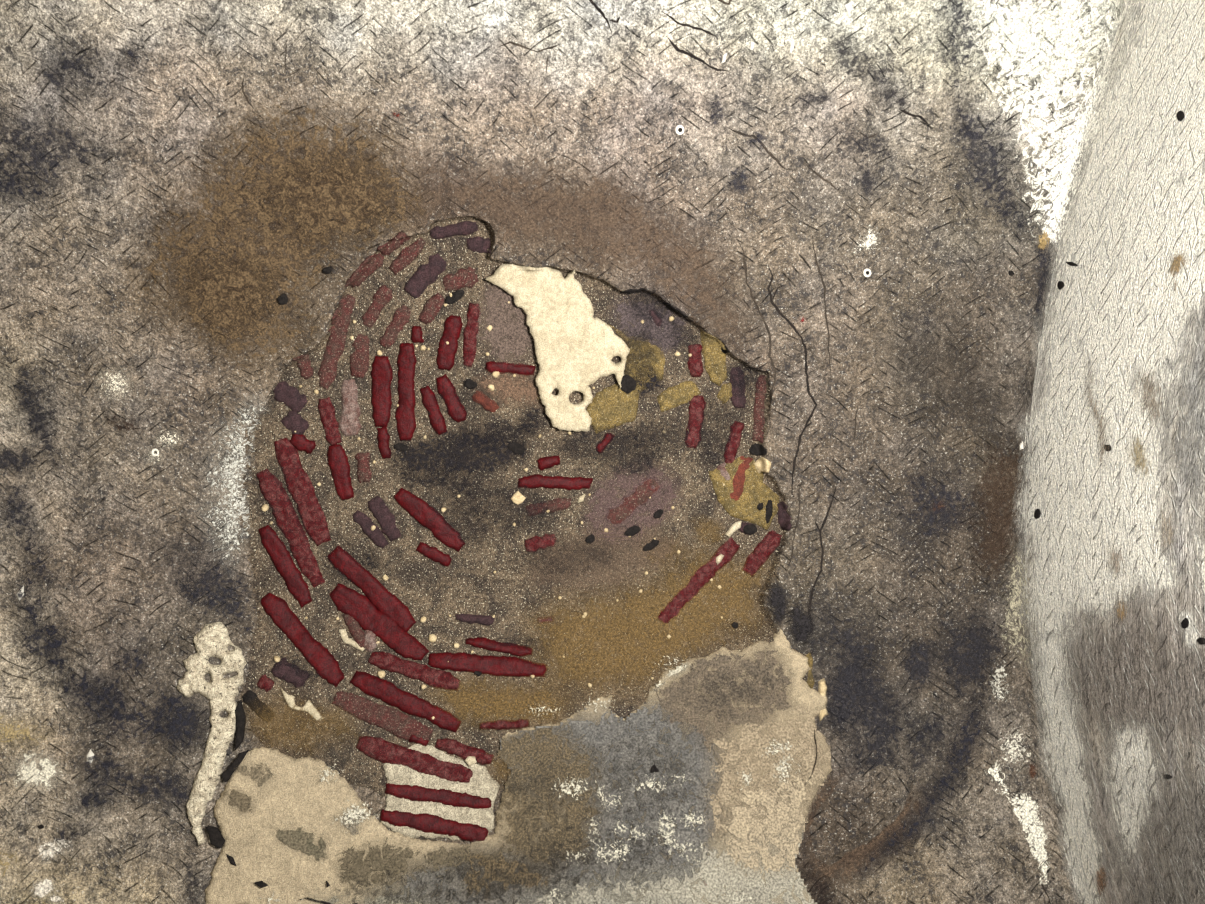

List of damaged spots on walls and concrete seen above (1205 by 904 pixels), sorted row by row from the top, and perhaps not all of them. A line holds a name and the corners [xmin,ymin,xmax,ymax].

leakage [132,102,749,368]
crack [589,0,620,33]
crack [663,12,729,72]
crack [900,110,928,124]
spalling [240,216,792,842]
crack [734,235,838,637]
peeling [948,0,1205,904]